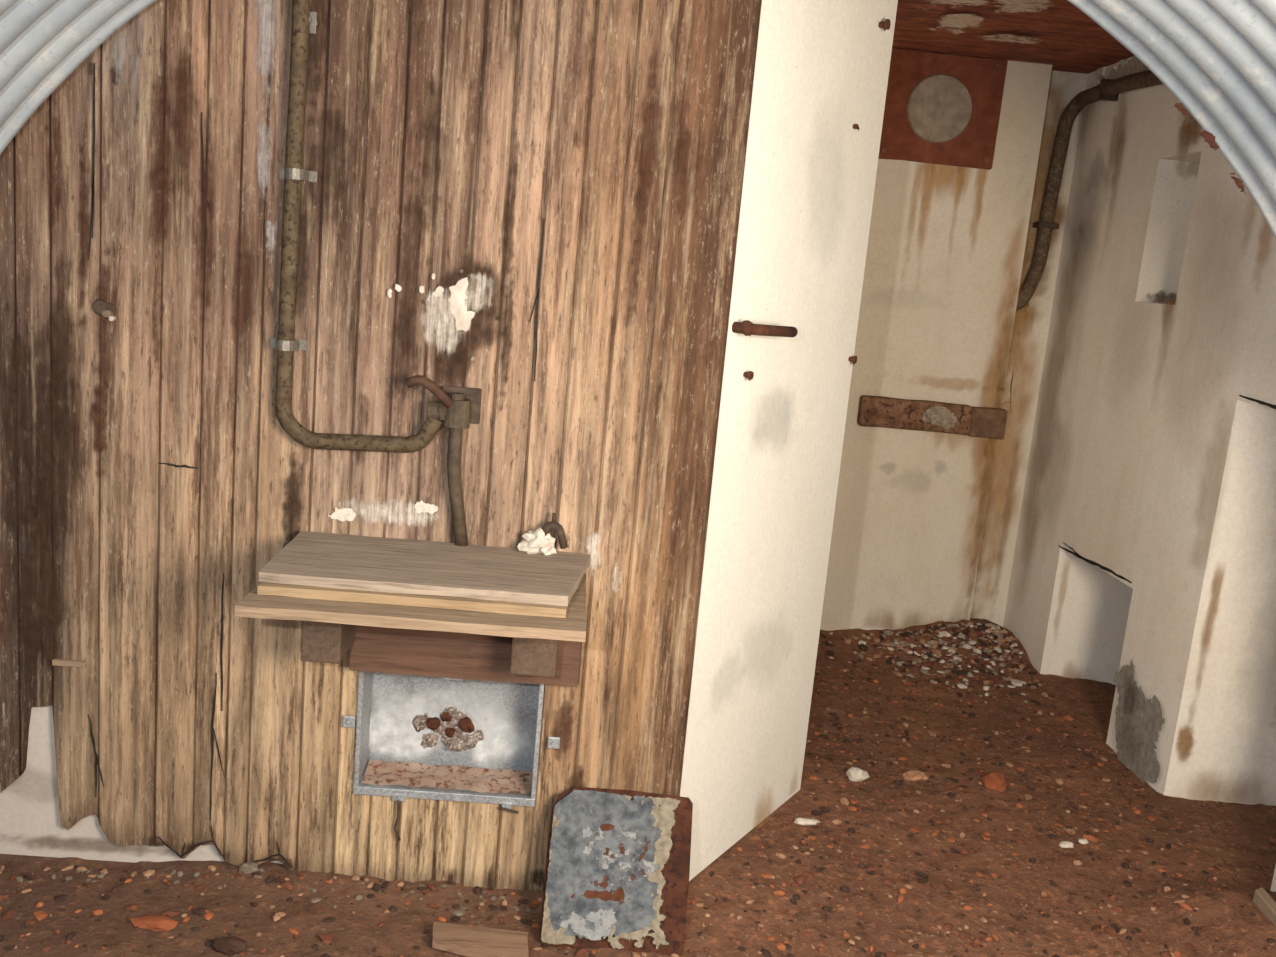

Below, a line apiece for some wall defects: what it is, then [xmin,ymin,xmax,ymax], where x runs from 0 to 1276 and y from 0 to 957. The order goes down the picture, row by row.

peeling [917,0,1052,44]
corrosion [1198,130,1219,150]
corrosion [923,163,986,217]
corrosion [1230,173,1246,194]
spalling [419,261,501,368]
corrosion [857,324,1008,554]